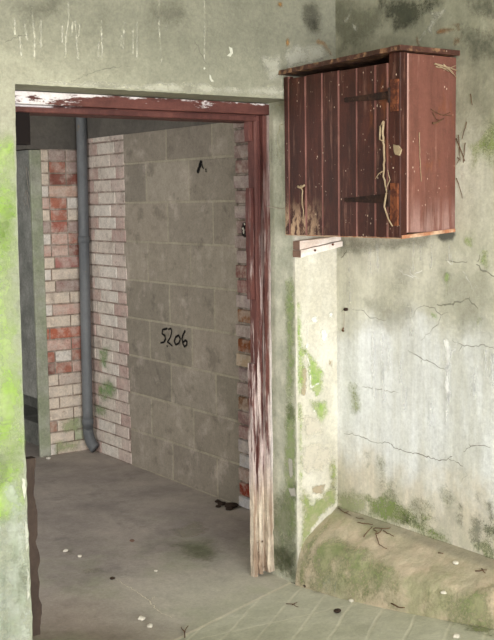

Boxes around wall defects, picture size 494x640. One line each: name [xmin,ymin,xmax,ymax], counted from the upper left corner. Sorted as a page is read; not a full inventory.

water stain [380,0,437,30]
crack [414,297,478,339]
crack [348,433,490,484]
water stain [471,519,492,542]